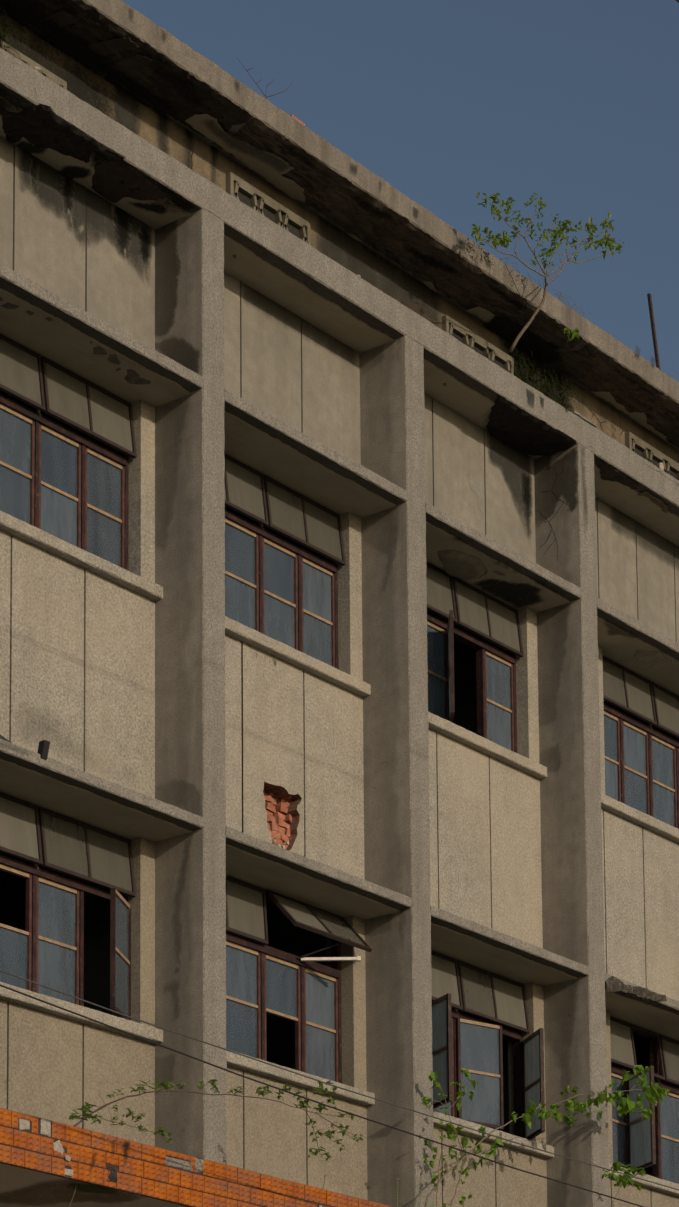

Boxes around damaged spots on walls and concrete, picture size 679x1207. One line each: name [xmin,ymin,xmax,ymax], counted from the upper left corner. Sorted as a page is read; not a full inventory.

leakage [14,141,199,374]
spalling [0,0,679,456]
spalling [263,781,302,851]
peeling [19,1118,74,1176]
peeling [107,1165,117,1182]
peeling [164,1156,203,1172]